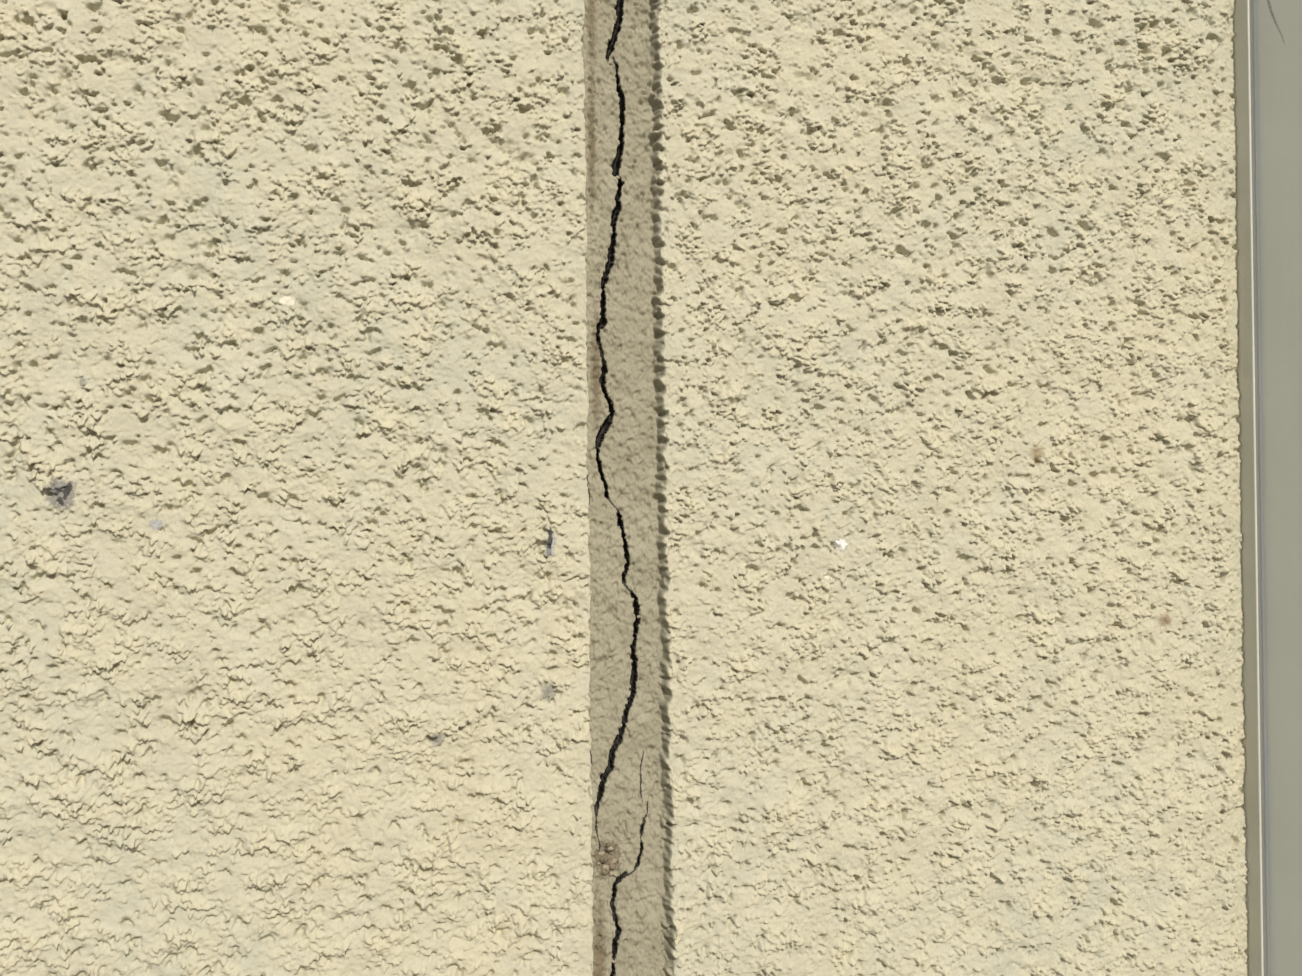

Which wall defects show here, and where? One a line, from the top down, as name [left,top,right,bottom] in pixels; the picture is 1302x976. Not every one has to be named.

crack [587,0,648,976]